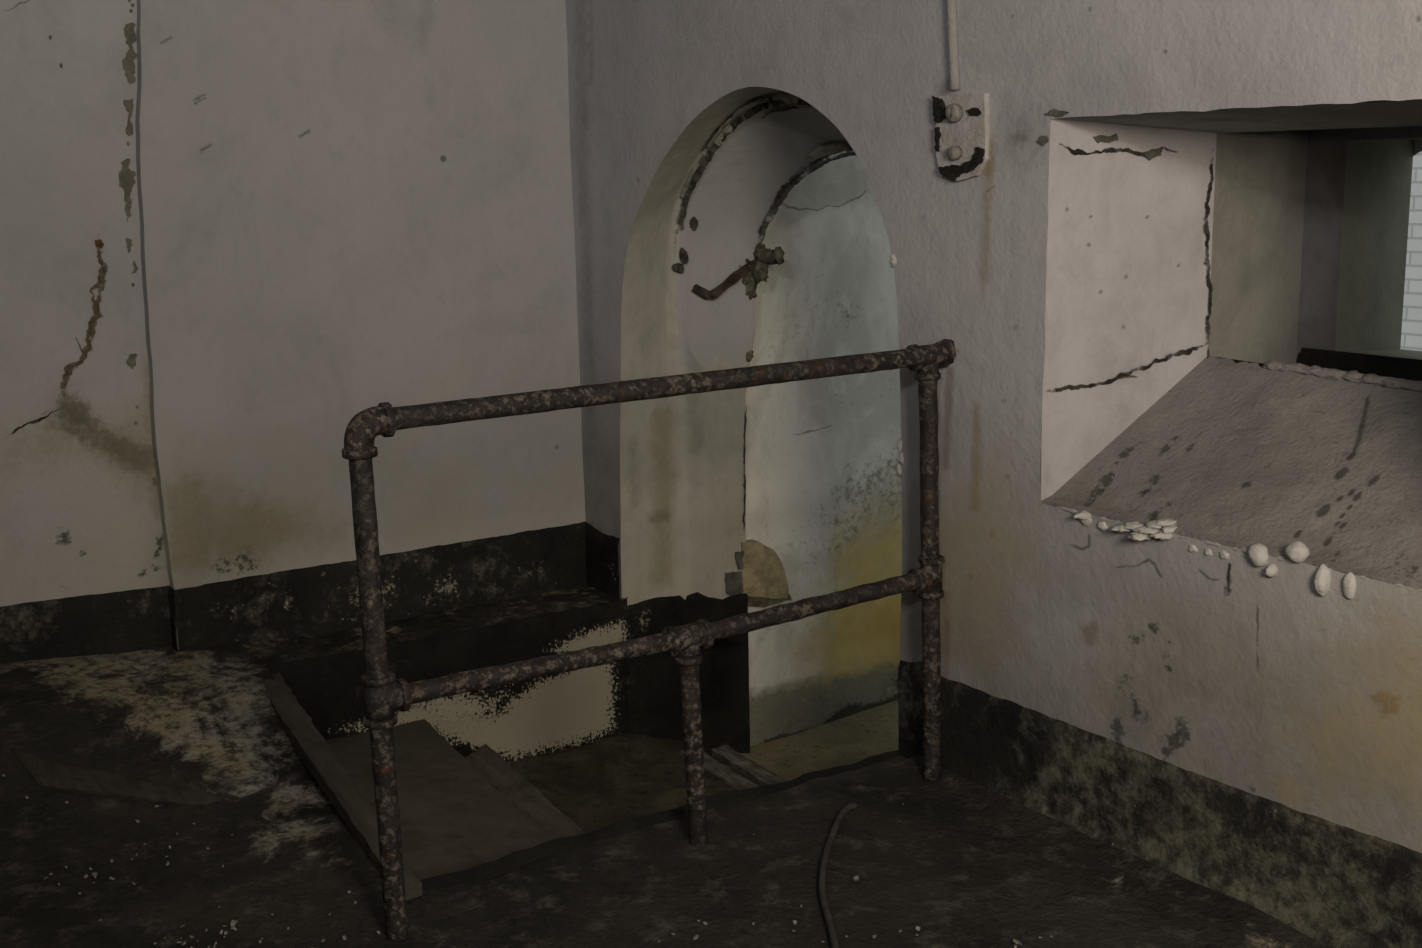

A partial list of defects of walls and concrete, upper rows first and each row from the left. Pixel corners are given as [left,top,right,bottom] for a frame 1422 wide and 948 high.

peeling [119,0,137,220]
crack [1036,109,1178,160]
spalling [738,143,857,300]
peeling [125,238,139,287]
crack [1049,164,1214,392]
crack [12,239,108,434]
peeling [126,353,137,369]
damp [823,679,898,725]
damp [1162,718,1191,759]